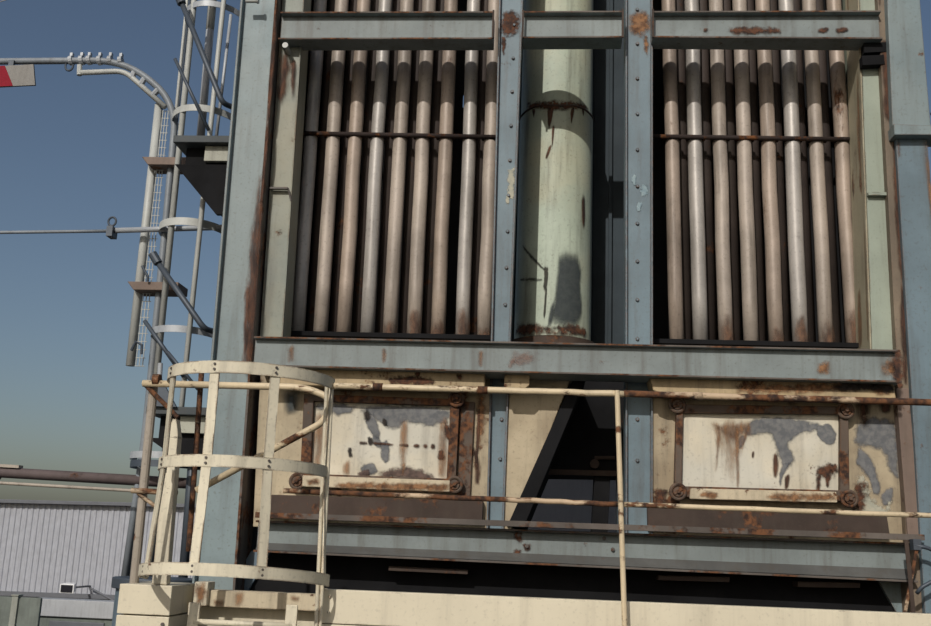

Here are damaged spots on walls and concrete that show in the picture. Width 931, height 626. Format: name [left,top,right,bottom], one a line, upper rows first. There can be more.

corrosion [501,11,520,55]
corrosion [730,26,781,34]
corrosion [528,100,588,158]
corrosion [243,14,296,362]
corrosion [893,142,902,276]
corrosion [516,323,586,337]
corrosion [736,363,843,393]
corrosion [874,288,907,413]
peeling [316,403,450,475]
corrosion [338,423,449,491]
peeling [739,417,836,485]
peeling [854,417,899,512]